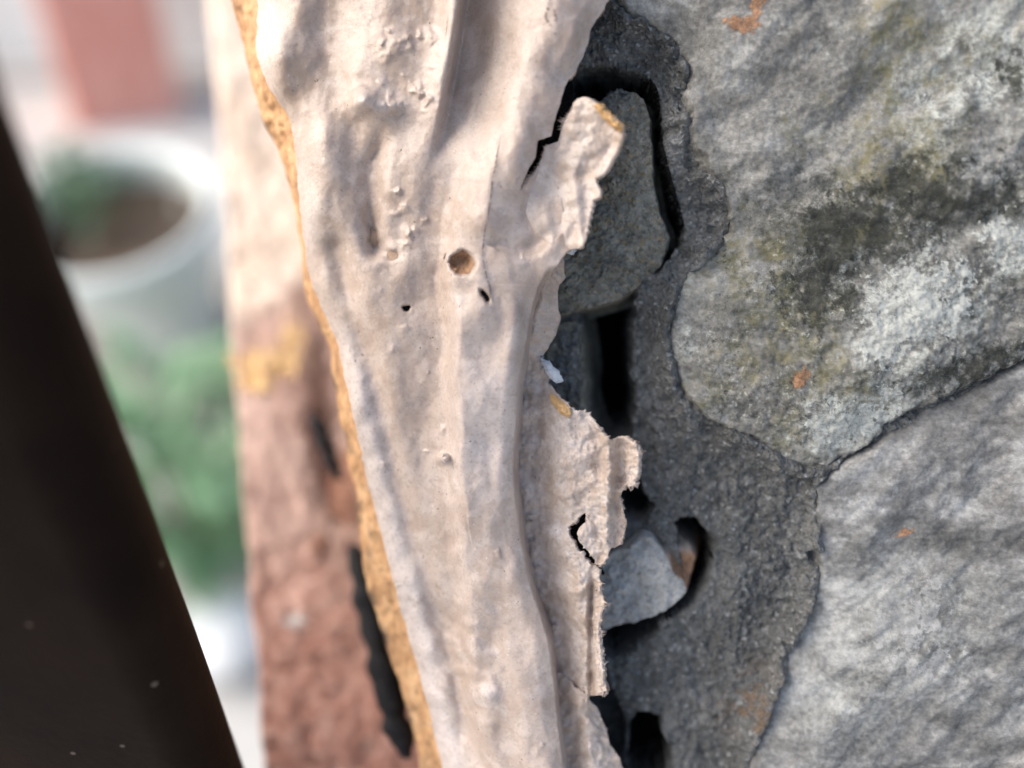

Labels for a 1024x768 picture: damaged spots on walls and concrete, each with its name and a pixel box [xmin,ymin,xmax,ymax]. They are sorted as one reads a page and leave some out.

peeling [520,97,667,768]
crack [570,513,605,575]
spalling [675,517,713,590]